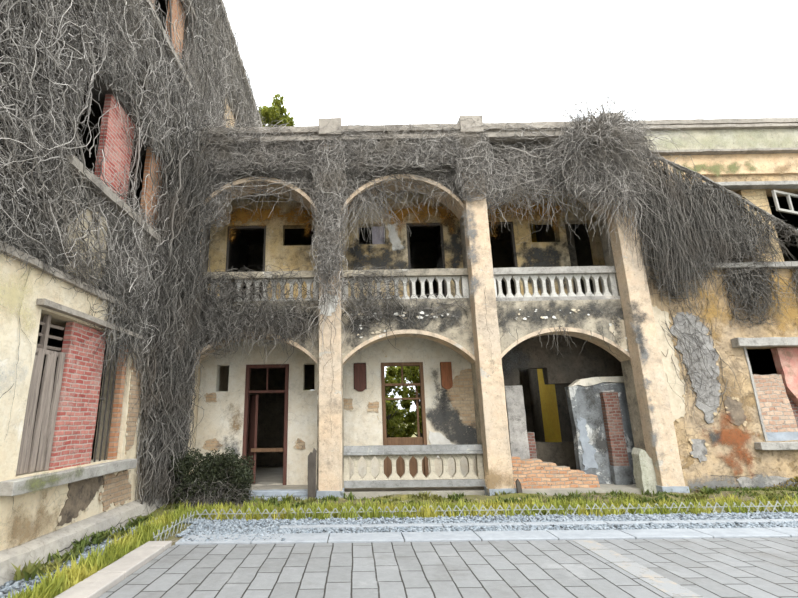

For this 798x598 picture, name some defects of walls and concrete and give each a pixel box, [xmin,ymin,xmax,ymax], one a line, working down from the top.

leakage [344,238,411,270]
leakage [386,190,477,268]
leakage [514,240,573,267]
leakage [343,302,468,351]
leakage [497,279,649,365]
spalling [652,305,748,427]
peeling [125,353,142,455]
leakage [426,370,477,445]
spalling [446,368,476,428]
spalling [293,438,306,450]
corrosion [714,415,759,474]
peeling [55,469,132,530]